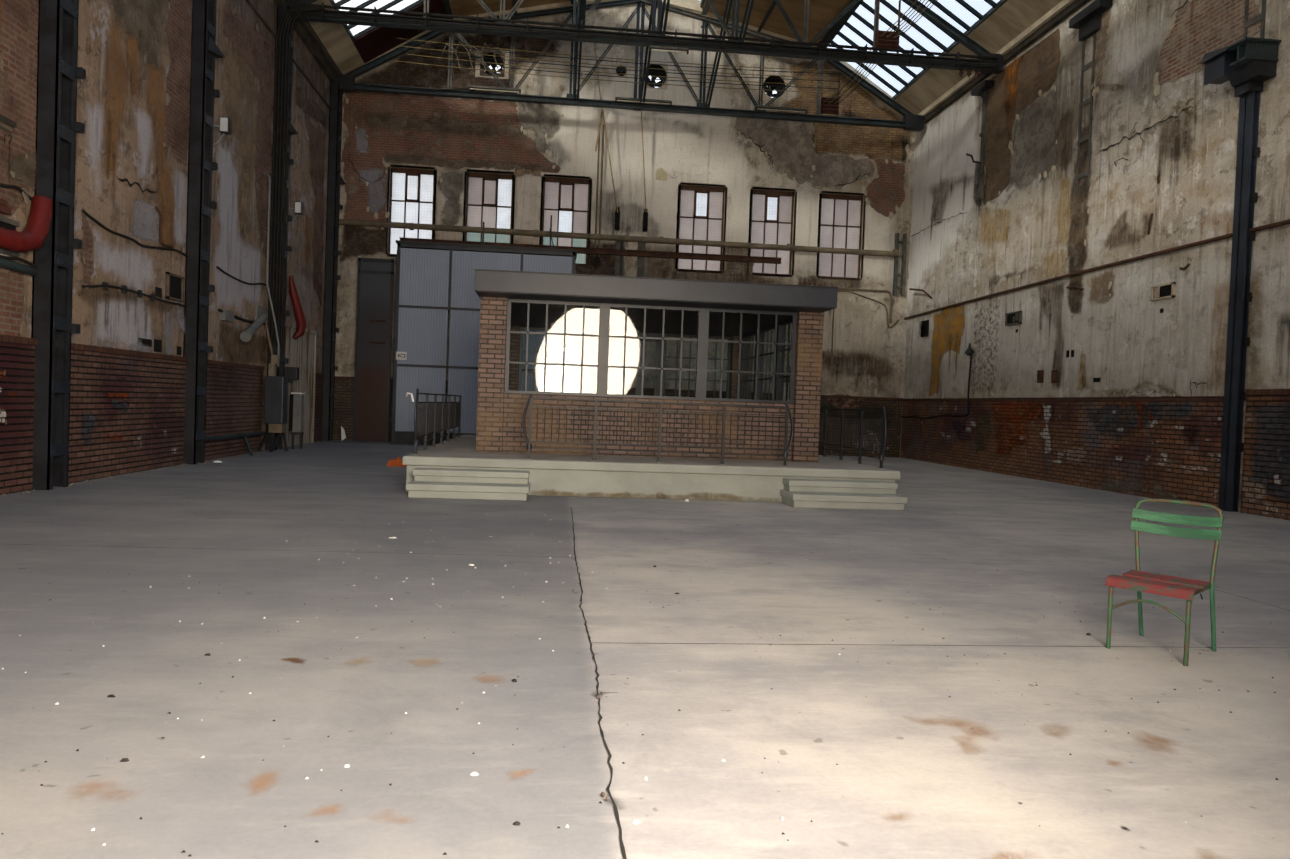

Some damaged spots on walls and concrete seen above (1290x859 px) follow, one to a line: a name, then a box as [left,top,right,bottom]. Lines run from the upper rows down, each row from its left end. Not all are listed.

flaking render [340,34,564,260]
flaking render [730,62,910,220]
flaking render [982,28,1060,207]
flaking render [1052,8,1123,318]
flaking render [1153,0,1261,97]
crack [571,508,627,859]